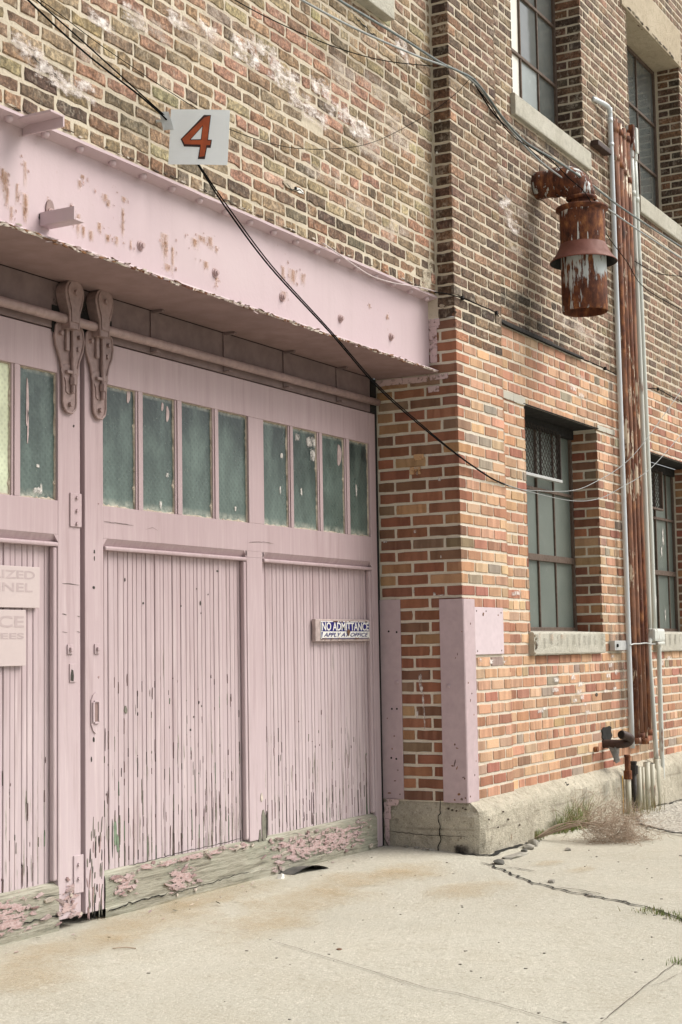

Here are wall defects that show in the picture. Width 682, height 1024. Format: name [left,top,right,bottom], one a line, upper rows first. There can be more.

leakage [91,12,110,31]
leakage [168,9,217,38]
leakage [12,33,95,103]
leakage [232,33,375,148]
spalling [199,189,296,233]
spalling [283,180,305,194]
peeling [0,221,182,286]
peeling [196,290,433,370]
peeling [0,674,373,937]
crack [384,799,682,920]